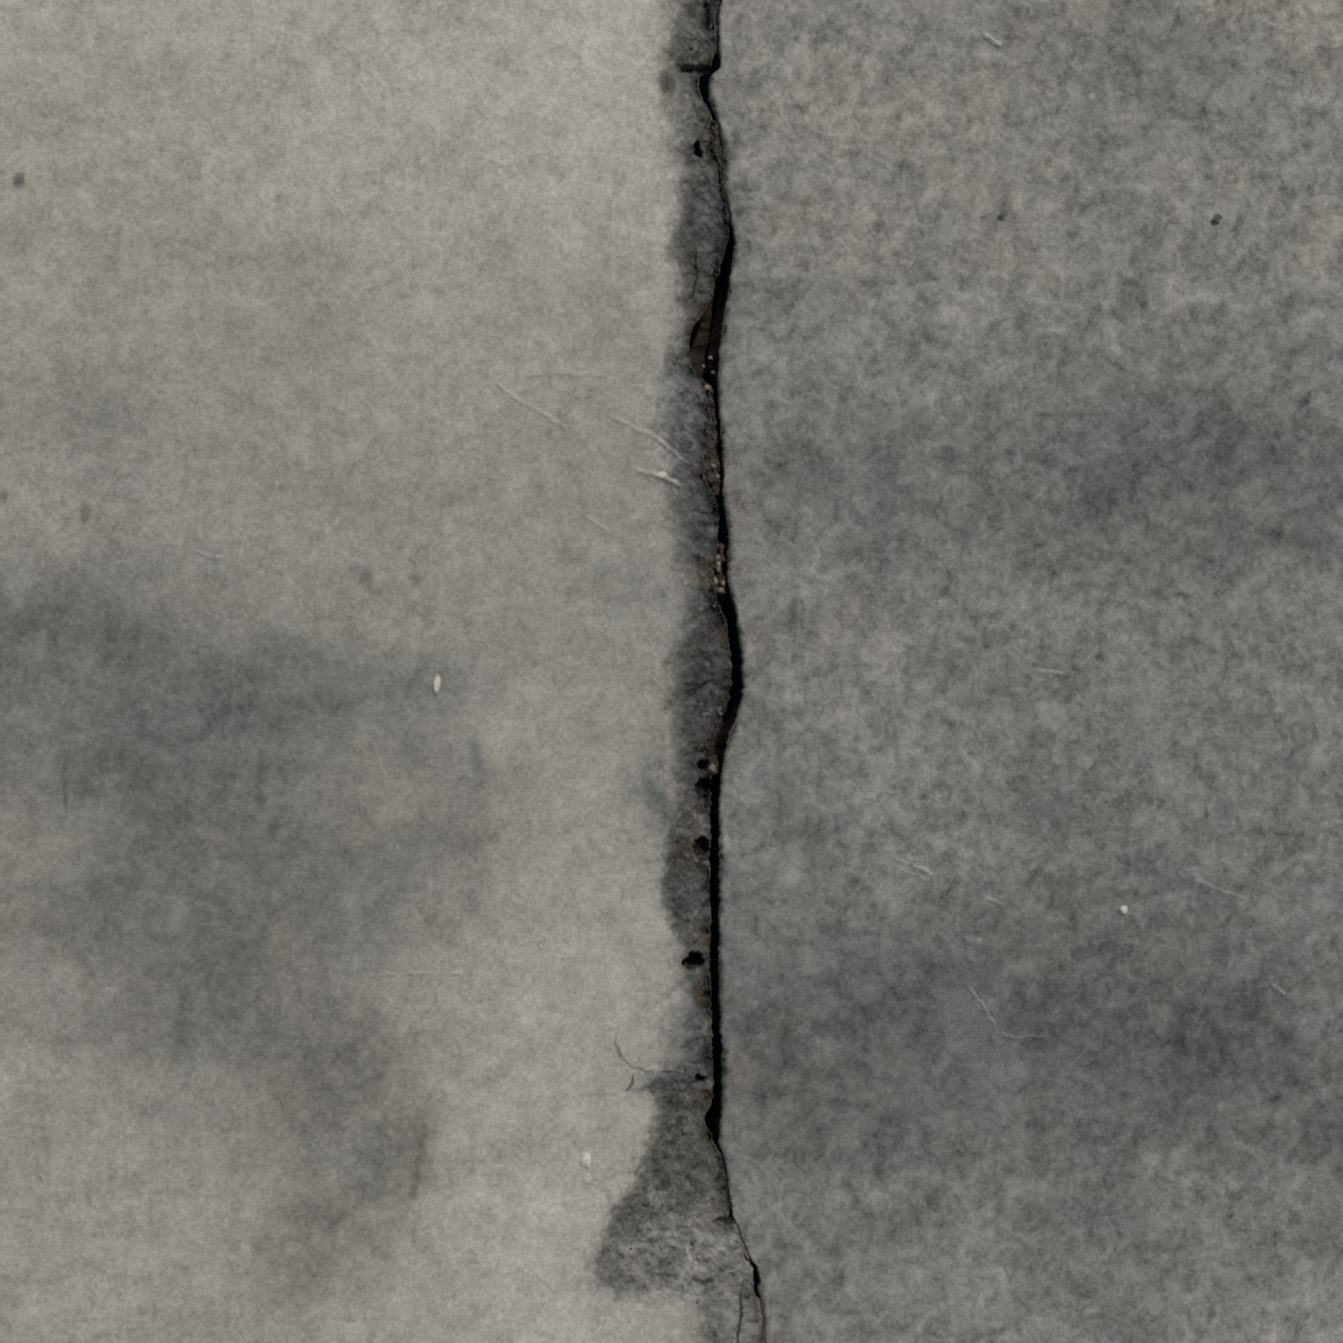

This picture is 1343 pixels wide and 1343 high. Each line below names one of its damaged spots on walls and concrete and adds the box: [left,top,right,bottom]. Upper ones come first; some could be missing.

spalling [578,0,764,1343]
crack [680,0,765,1343]